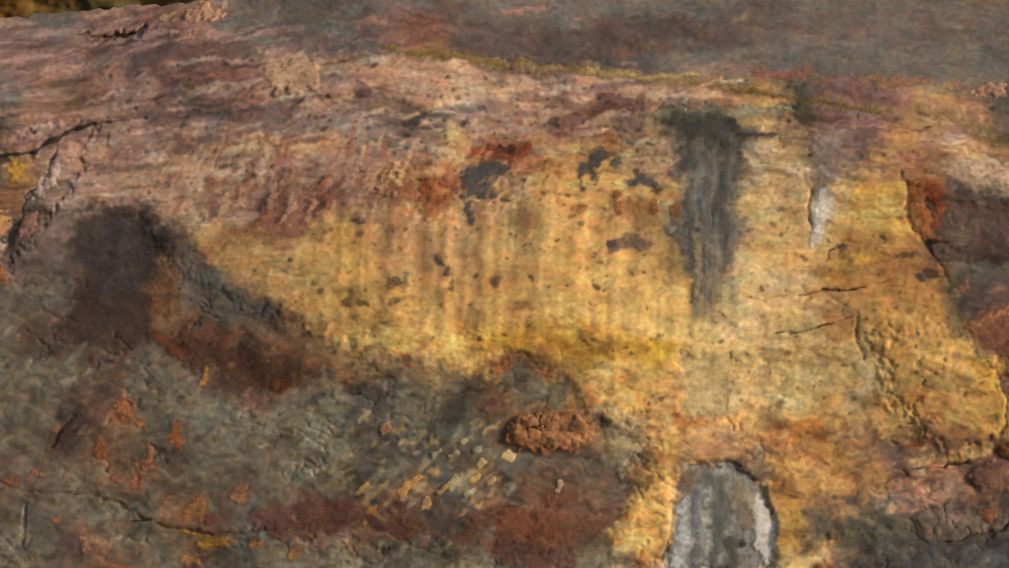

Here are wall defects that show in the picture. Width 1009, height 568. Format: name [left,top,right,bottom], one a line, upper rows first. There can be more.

crack [0,120,122,248]
corrosion [471,141,532,162]
damp [381,44,1009,318]
corrosion [910,178,946,234]
damp [47,198,169,355]
corrosion [180,536,228,565]
damp [667,461,776,568]